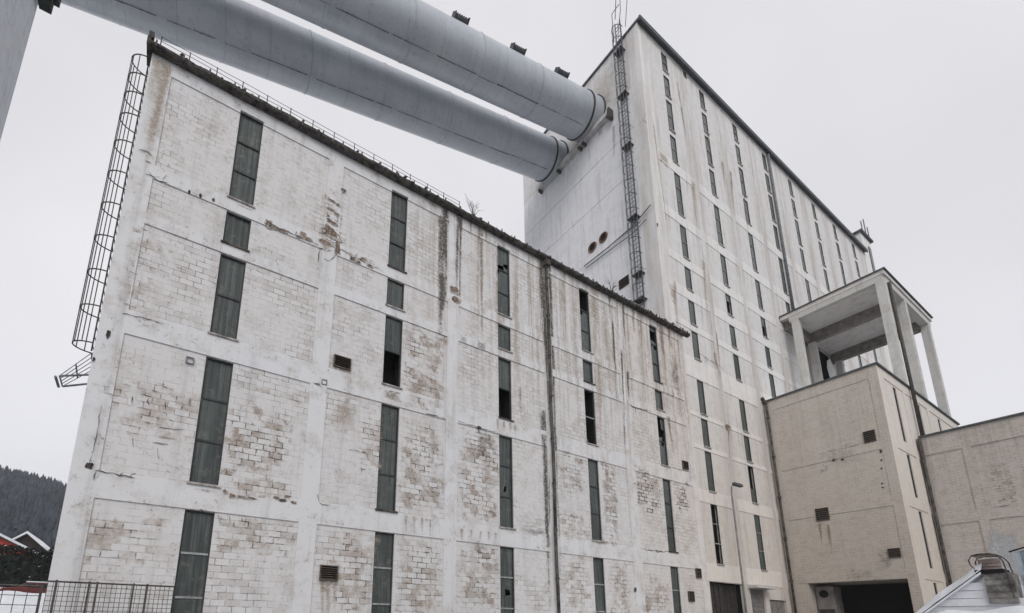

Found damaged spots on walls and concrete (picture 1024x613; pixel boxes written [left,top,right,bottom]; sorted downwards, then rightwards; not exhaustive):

water stain [116,0,582,169]
spalling [264,188,373,269]
water stain [438,209,486,325]
peeling [408,333,447,402]
peeling [223,410,297,504]
peeling [460,426,498,516]
peeling [637,469,659,513]